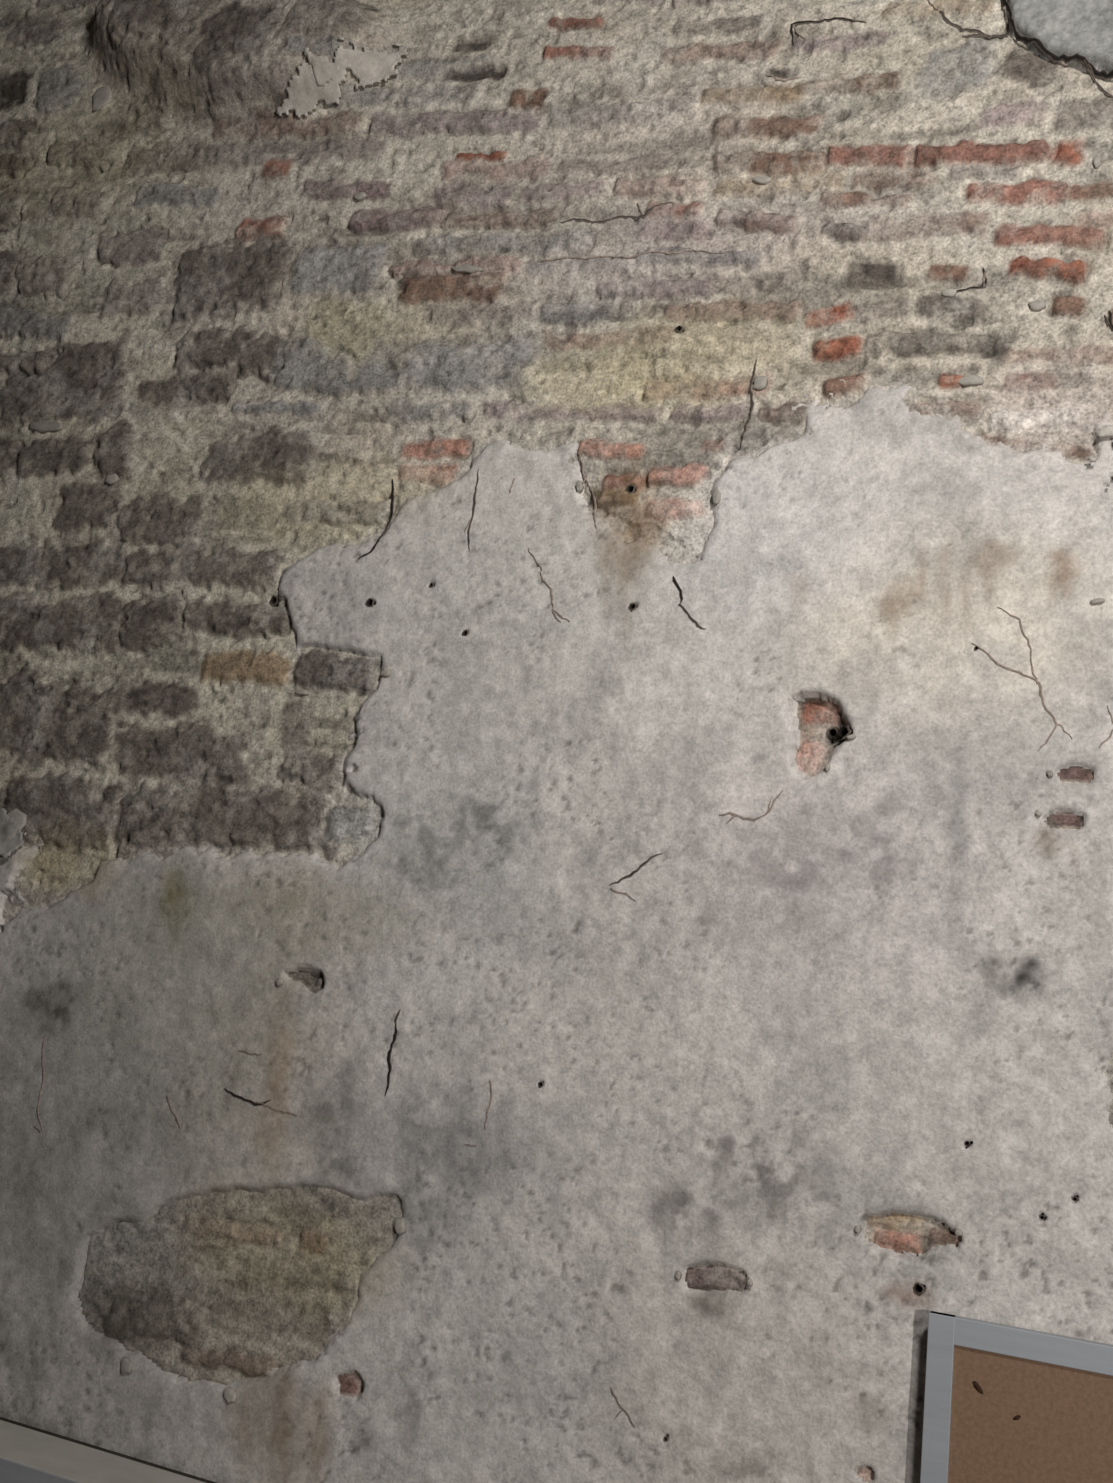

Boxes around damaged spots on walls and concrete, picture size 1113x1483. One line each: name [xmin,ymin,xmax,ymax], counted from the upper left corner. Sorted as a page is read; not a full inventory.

crack [928,0,1113,98]
flaking render [0,0,1113,924]
crack [972,607,1113,750]
flaking render [276,970,324,993]
flaking render [1104,1052,1113,1128]
flaking render [78,1186,406,1403]
flaking render [675,1263,753,1292]
flaking render [855,1212,963,1256]